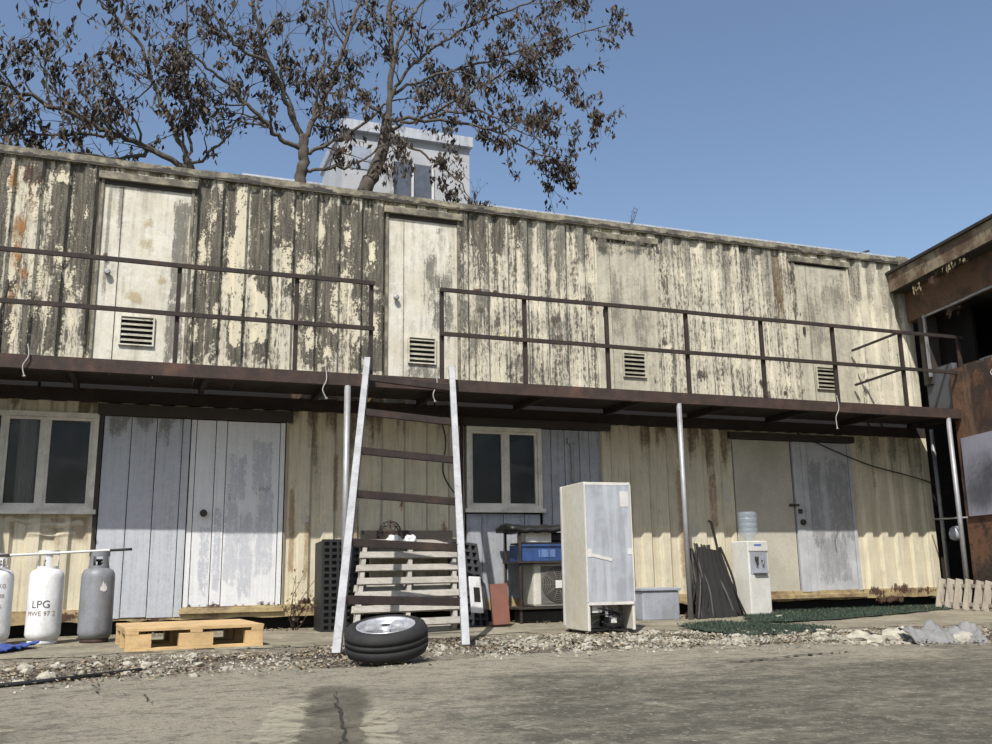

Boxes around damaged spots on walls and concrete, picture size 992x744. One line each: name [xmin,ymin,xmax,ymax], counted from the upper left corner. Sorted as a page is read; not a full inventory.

rust [9,164,42,188]
peeling [7,159,72,223]
rust [9,215,28,305]
peeling [1,228,76,348]
peeling [189,308,199,346]
peeling [196,201,217,282]
peeling [212,187,268,348]
peeling [273,199,325,300]
peeling [303,220,381,361]
water stain [424,210,657,366]
water stain [772,255,789,317]